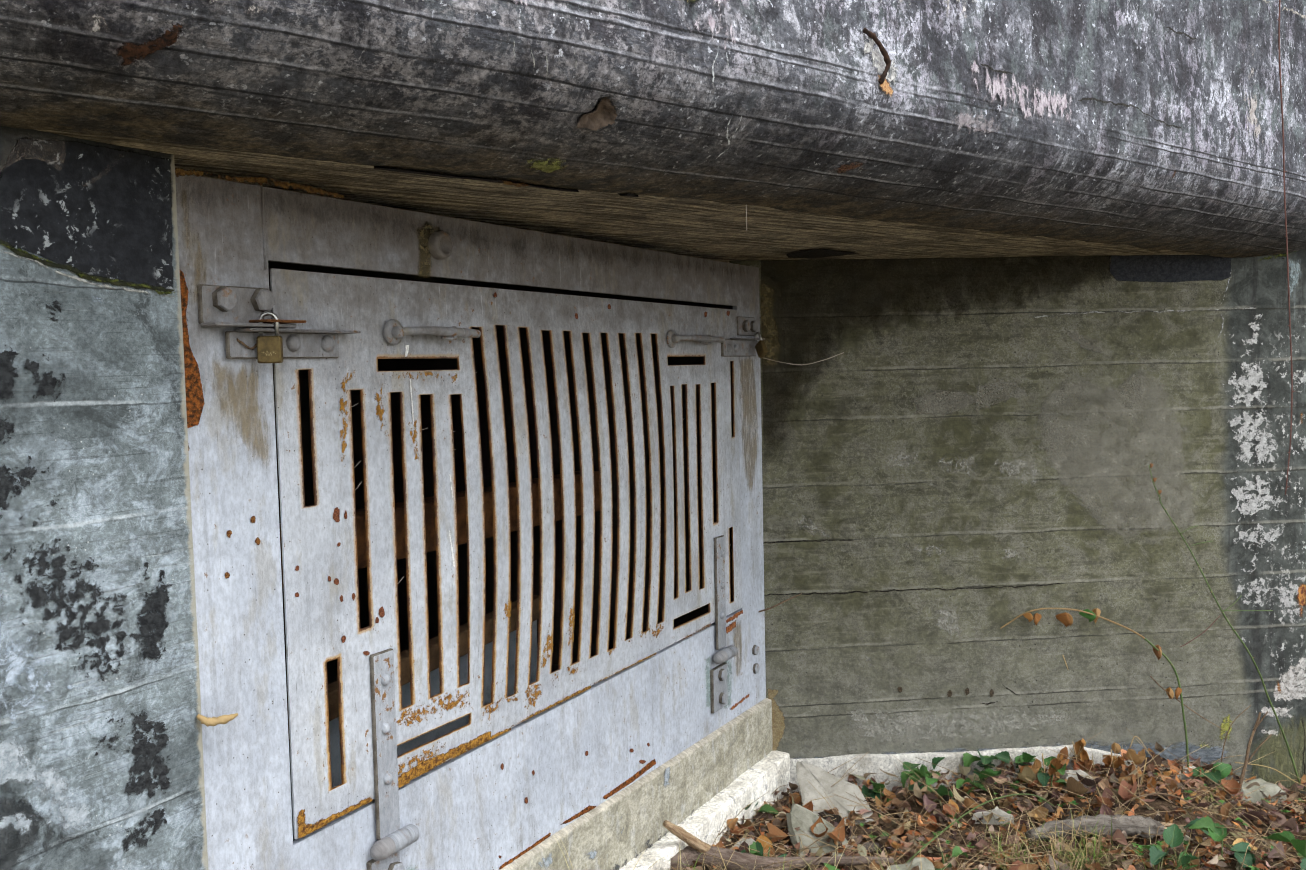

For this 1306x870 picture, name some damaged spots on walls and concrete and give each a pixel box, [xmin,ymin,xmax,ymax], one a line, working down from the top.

corrosion [878,75,893,96]
peeling [44,291,62,322]
peeling [0,345,66,403]
corrosion [180,240,268,459]
peeling [0,419,14,444]
peeling [0,455,62,526]
peeling [3,537,179,700]
corrosion [675,610,743,670]
corrosion [397,605,664,788]
peeling [95,710,174,853]
corrosion [297,797,372,839]